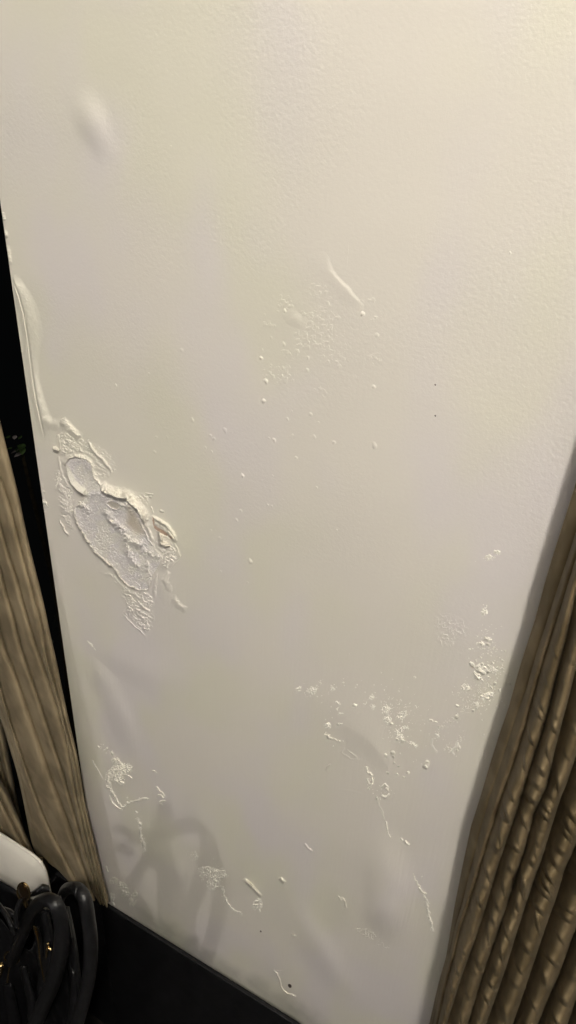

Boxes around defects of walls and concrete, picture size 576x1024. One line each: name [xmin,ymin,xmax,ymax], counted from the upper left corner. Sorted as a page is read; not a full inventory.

peeling [40,417,188,636]
peeling [92,744,166,853]
peeling [193,851,263,915]